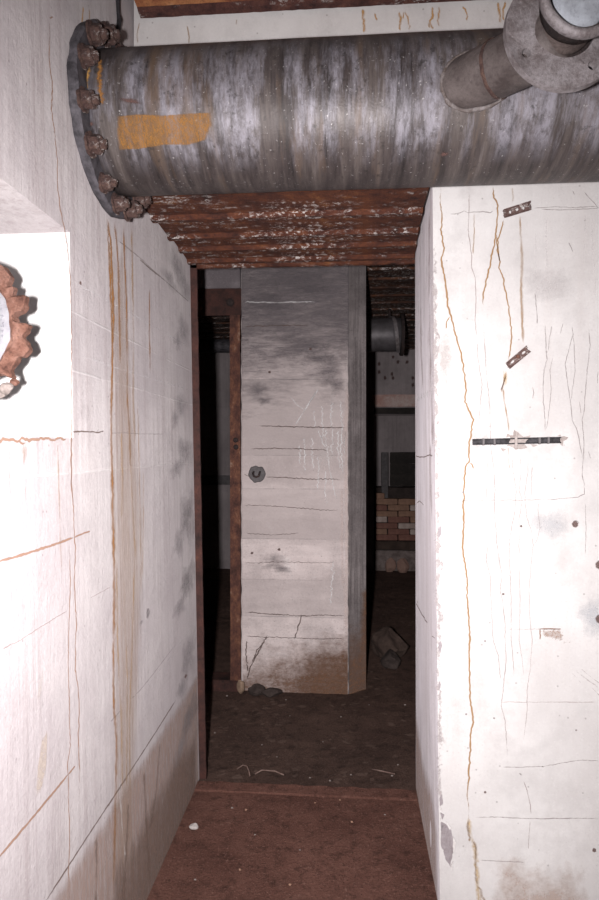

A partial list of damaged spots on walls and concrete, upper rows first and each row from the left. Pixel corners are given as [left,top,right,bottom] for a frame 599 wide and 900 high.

rust [87,60,104,103]
rust [108,225,134,411]
crack [0,17,174,898]
rust [111,422,143,721]
crack [245,612,341,678]
damp [244,592,366,694]
crack [440,190,598,819]
peeling [439,795,456,870]